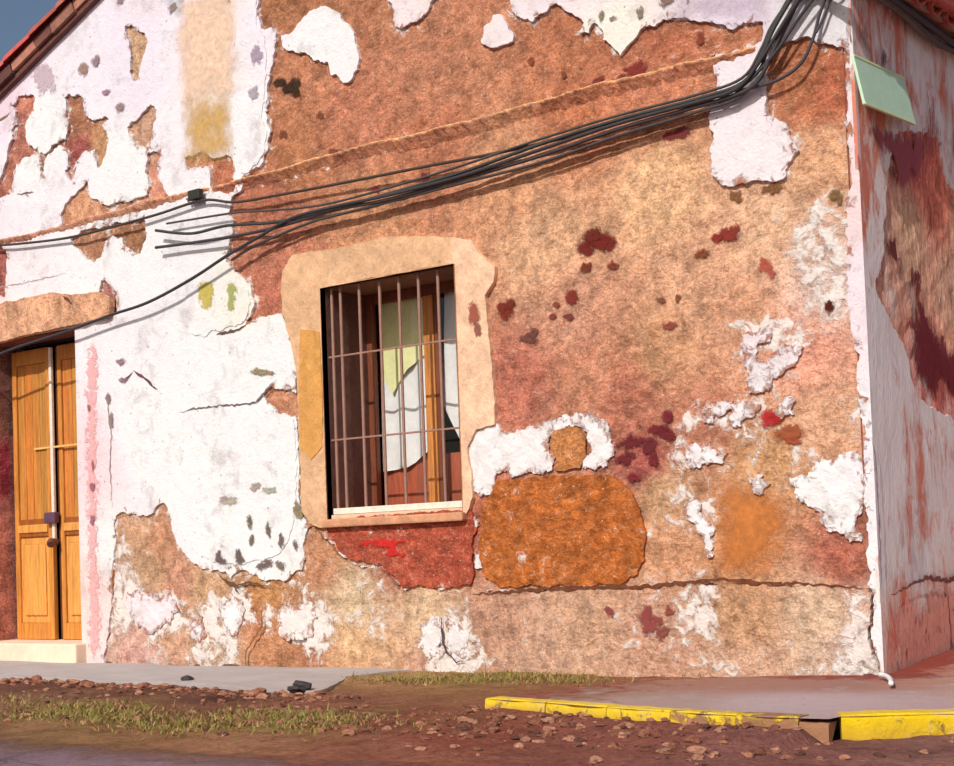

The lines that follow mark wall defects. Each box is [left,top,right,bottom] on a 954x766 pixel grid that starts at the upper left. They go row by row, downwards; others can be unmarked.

spalling [77,54,99,77]
peeling [0,95,125,198]
peeling [63,106,168,261]
water stain [869,92,942,187]
water stain [890,238,899,262]
peeling [105,0,880,678]
water stain [909,265,954,401]
crack [178,379,277,413]
crack [478,442,954,650]
water stain [891,583,954,672]